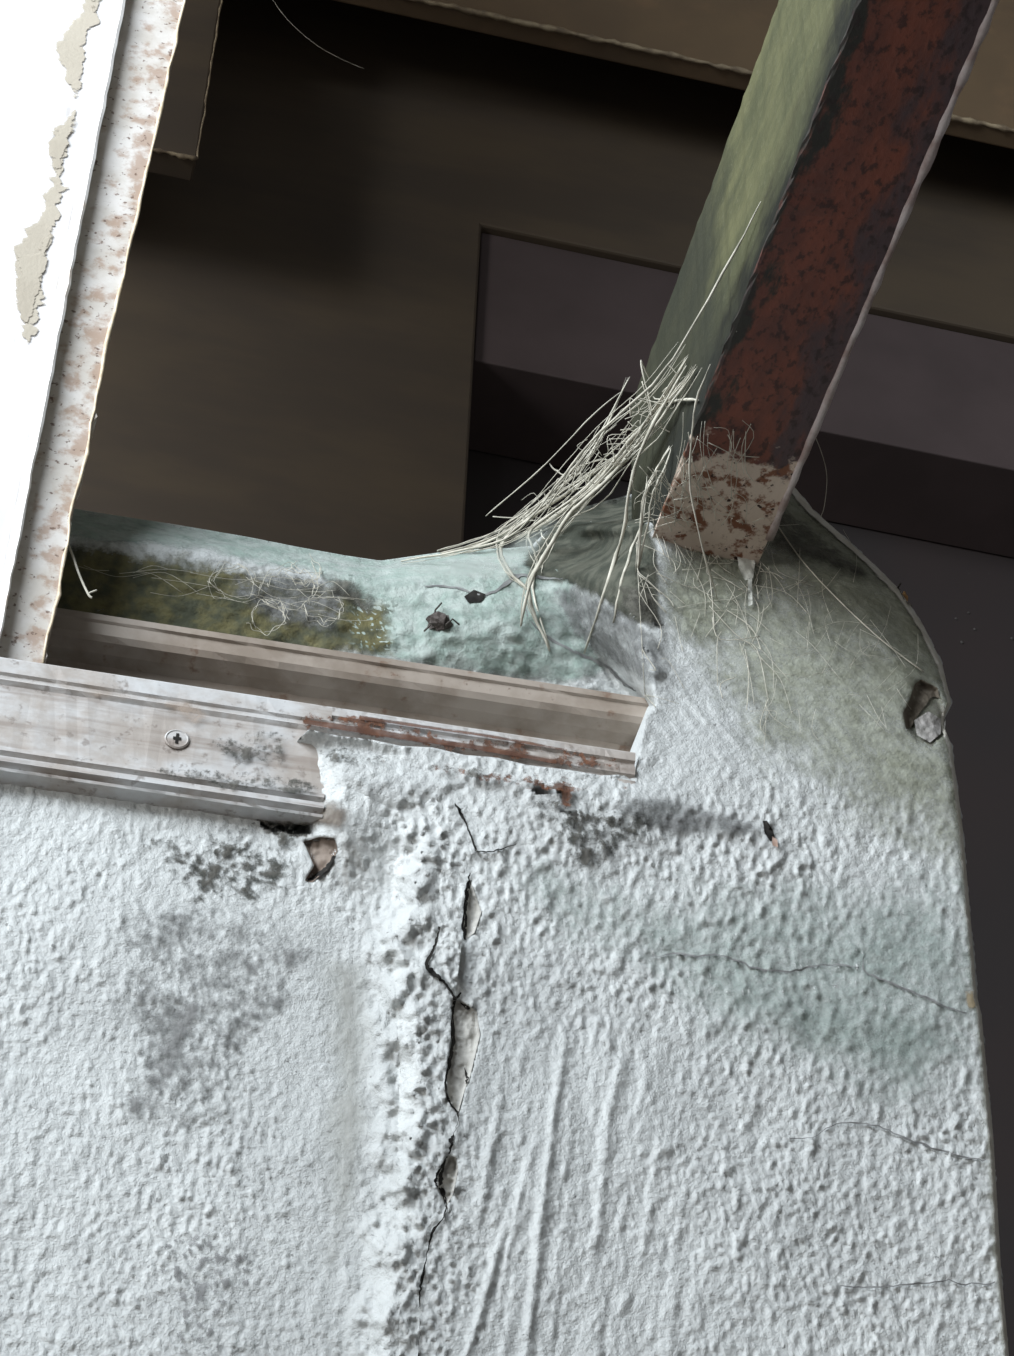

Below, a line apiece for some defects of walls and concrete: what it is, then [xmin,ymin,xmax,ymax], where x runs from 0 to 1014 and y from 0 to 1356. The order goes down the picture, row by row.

peeling [13,0,100,343]
corrosion [303,715,617,807]
water stain [539,798,753,865]
water stain [127,803,346,1114]
crack [651,952,967,1014]
crack [418,803,516,1356]
crack [789,1122,986,1162]
crack [841,1279,995,1288]